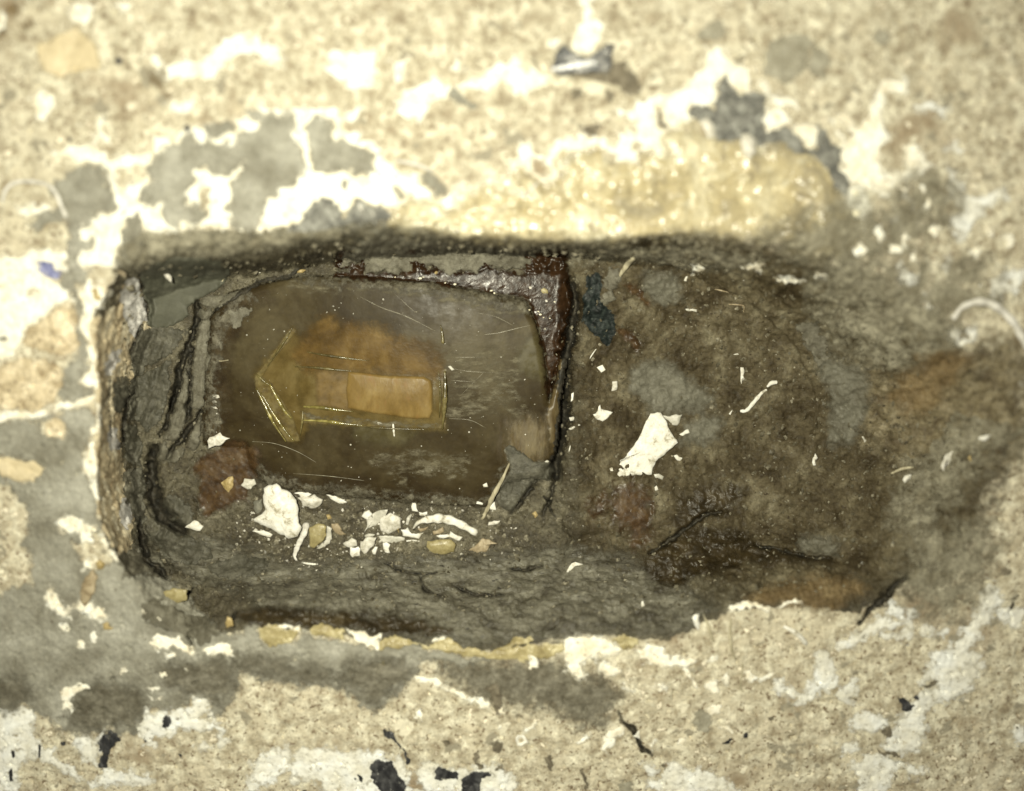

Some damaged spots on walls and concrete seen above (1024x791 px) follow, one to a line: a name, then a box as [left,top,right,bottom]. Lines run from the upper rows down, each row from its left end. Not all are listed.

peeling [325,49,551,123]
peeling [510,45,819,186]
damp [581,273,616,346]
crack [137,262,308,578]
damp [0,110,565,737]
spalling [0,104,1008,694]
crack [510,283,580,517]
damp [803,168,1024,625]
crack [648,511,723,554]
damp [649,484,832,586]
crack [858,576,908,625]
peeling [60,682,90,713]